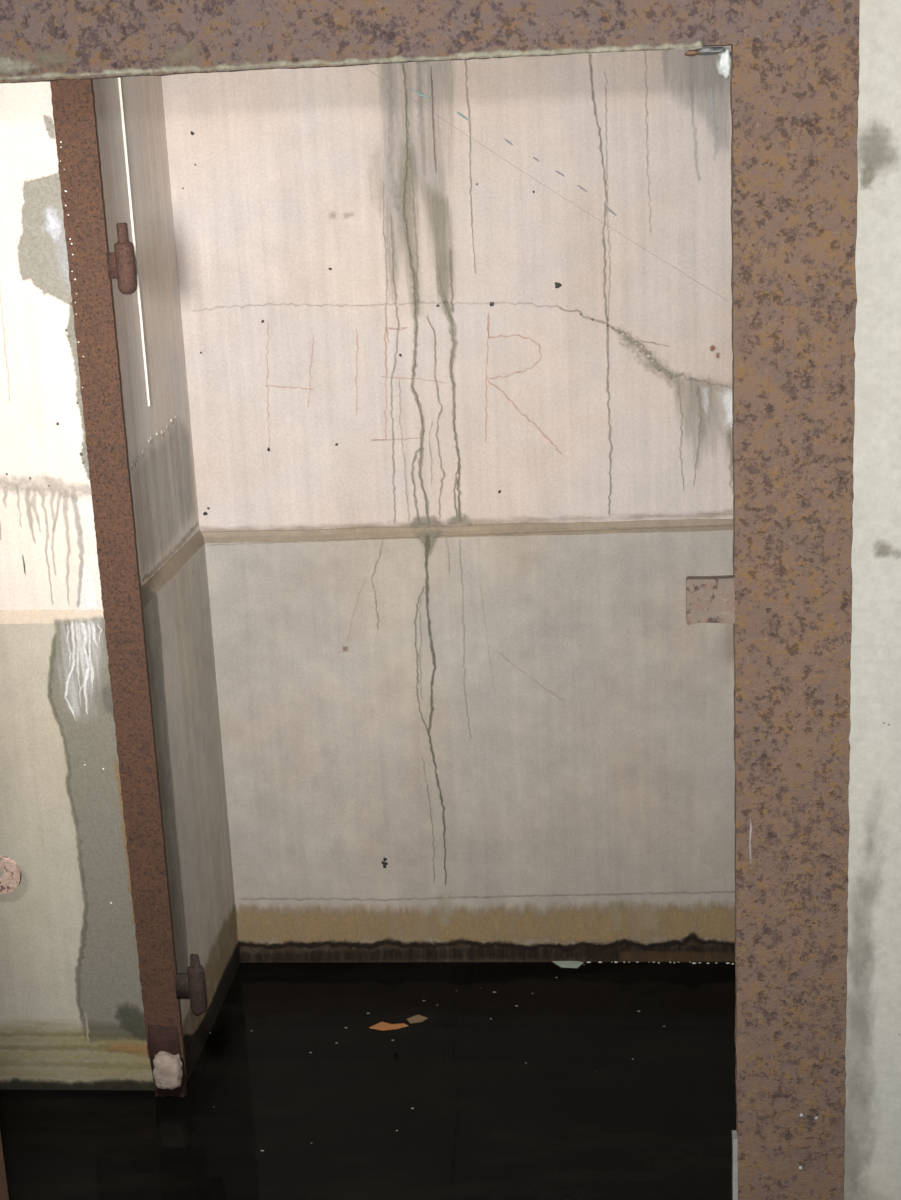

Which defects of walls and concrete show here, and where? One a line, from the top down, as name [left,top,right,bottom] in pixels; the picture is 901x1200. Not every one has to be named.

peeling [16,116,90,479]
crack [403,63,466,885]
crack [589,53,611,511]
water stain [689,381,733,442]
water stain [0,473,155,1091]
water stain [183,905,735,1084]